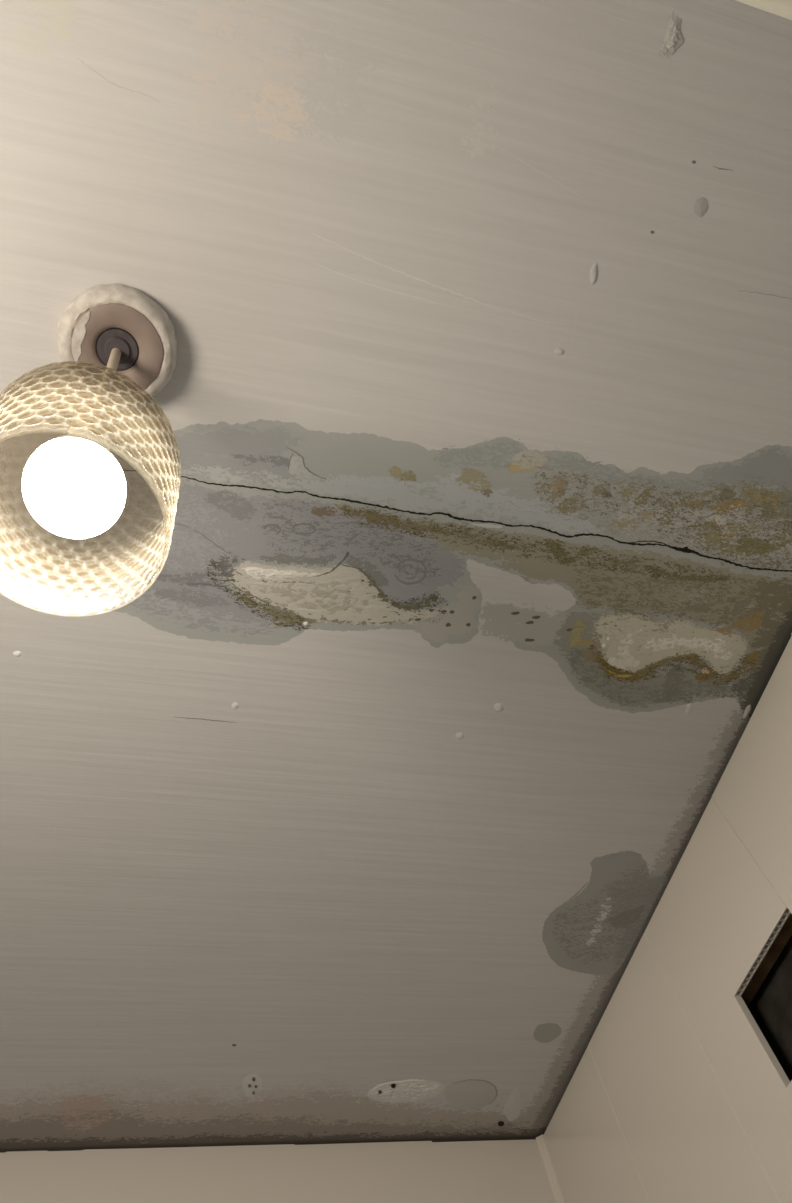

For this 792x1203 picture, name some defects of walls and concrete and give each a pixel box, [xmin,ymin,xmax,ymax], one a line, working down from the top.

peeling [229,560,450,626]
water stain [44,419,792,718]
crack [124,447,792,572]
peeling [592,612,749,676]
water stain [542,851,670,977]